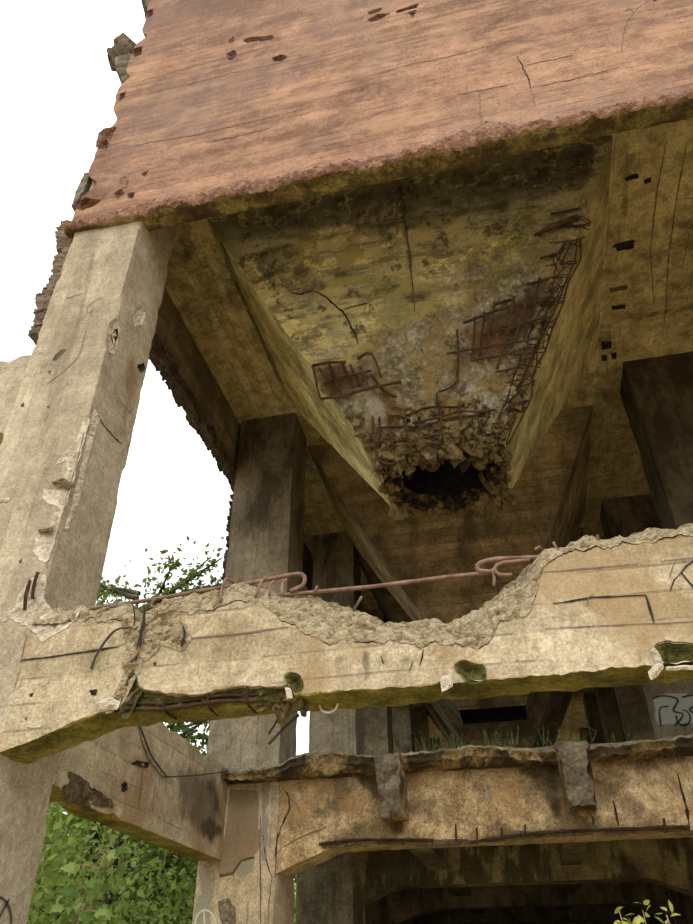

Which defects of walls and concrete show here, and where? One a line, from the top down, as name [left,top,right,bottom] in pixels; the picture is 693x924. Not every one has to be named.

spalling [368,3,418,22]
crack [378,0,649,120]
water stain [331,146,594,237]
crack [291,290,367,343]
spalling [312,184,592,522]
spalling [601,341,617,361]
spalling [33,407,100,562]
spalling [0,523,693,720]
crack [546,564,635,572]
crack [546,594,693,629]
crack [660,558,693,591]
crack [259,788,327,924]